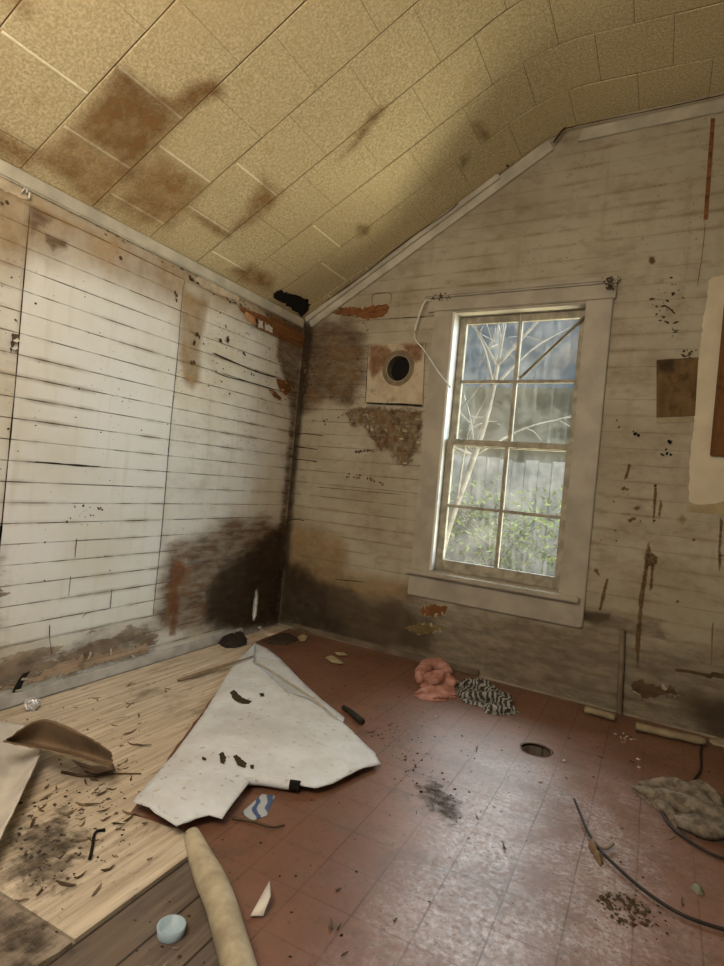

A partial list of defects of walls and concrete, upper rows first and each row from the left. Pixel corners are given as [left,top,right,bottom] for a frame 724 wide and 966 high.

peeling [0,172,38,205]
damp [47,78,219,202]
peeling [5,333,20,353]
peeling [213,290,423,466]
damp [158,311,428,650]
peeling [0,624,158,693]
corrosion [635,545,657,665]